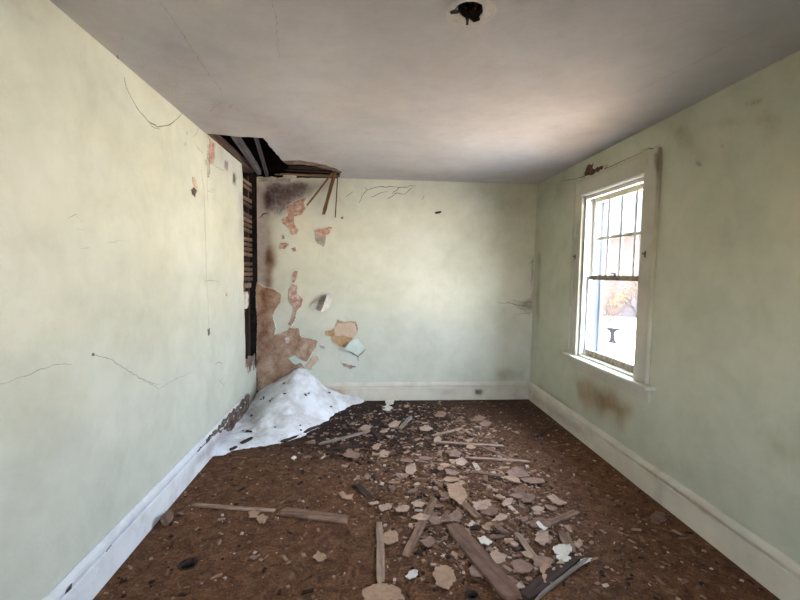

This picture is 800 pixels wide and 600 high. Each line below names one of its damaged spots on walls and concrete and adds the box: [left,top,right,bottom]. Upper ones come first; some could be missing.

crack [124,78,182,129]
peeling [207,135,215,177]
crack [346,185,424,202]
peeling [197,160,364,452]
crack [94,354,190,389]